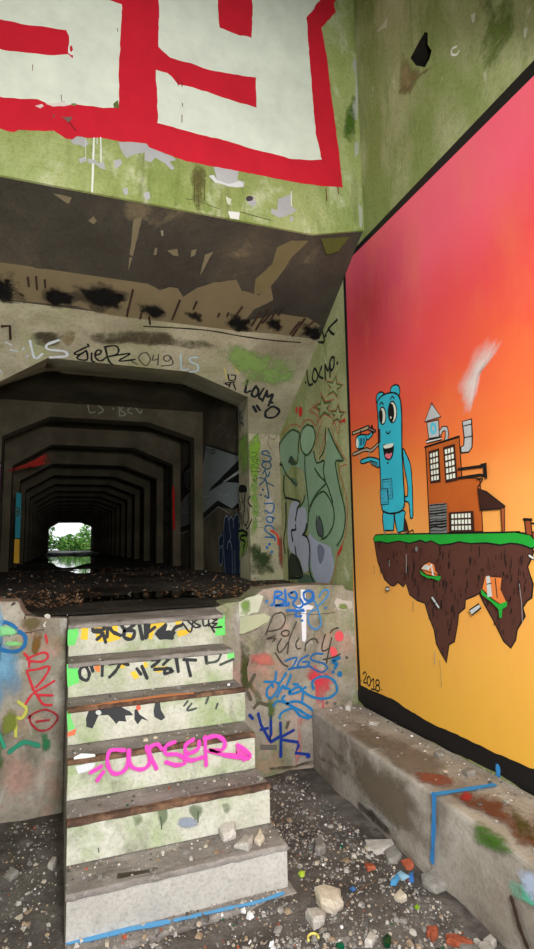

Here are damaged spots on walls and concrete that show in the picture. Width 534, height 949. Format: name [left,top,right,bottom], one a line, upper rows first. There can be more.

peeling [209,167,257,220]
peeling [271,194,297,221]
damp [35,332,74,346]
damp [93,332,209,348]